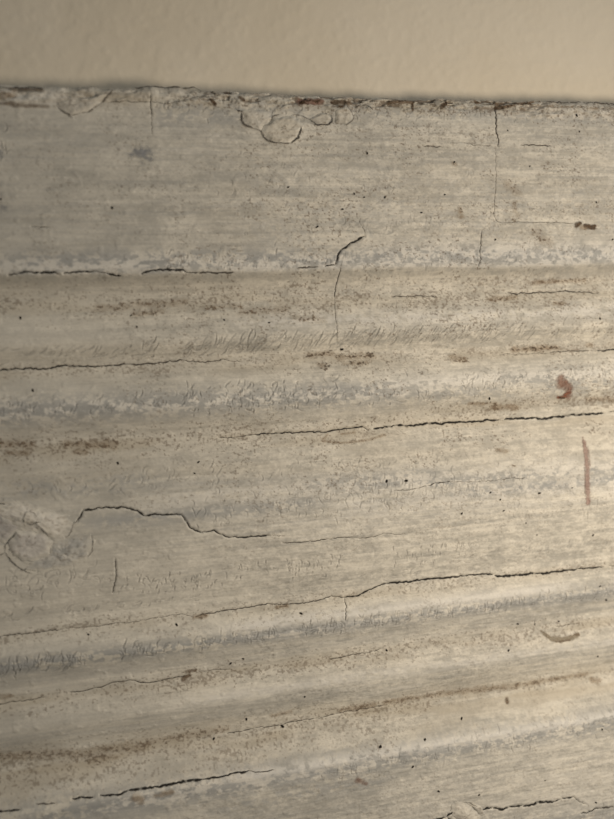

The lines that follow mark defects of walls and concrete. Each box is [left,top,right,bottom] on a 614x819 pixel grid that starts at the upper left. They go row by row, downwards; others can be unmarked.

spalling [224,92,373,144]
crack [467,107,571,264]
crack [10,270,121,278]
crack [142,267,234,275]
crack [299,221,365,338]
crack [0,359,240,371]
corrosion [557,376,572,399]
crack [220,411,614,438]
crack [78,506,401,543]
crack [4,565,612,636]
crack [0,769,273,812]
crack [483,797,613,813]